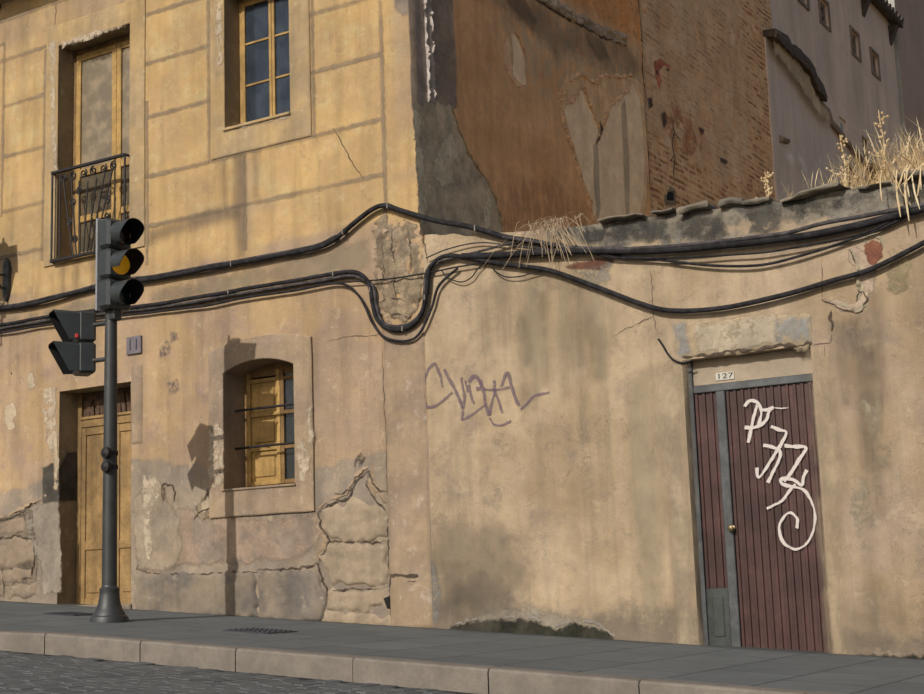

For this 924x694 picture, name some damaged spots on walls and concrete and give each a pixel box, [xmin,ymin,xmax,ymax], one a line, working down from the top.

flaking render [502,26,527,87]
spalling [654,58,670,88]
flaking render [558,71,653,232]
spalling [661,107,704,154]
flaking render [371,212,424,324]
flaking render [821,233,885,330]
flaking render [4,402,17,431]
peeling [26,371,59,490]
peeling [194,422,224,522]
peeling [296,408,314,482]